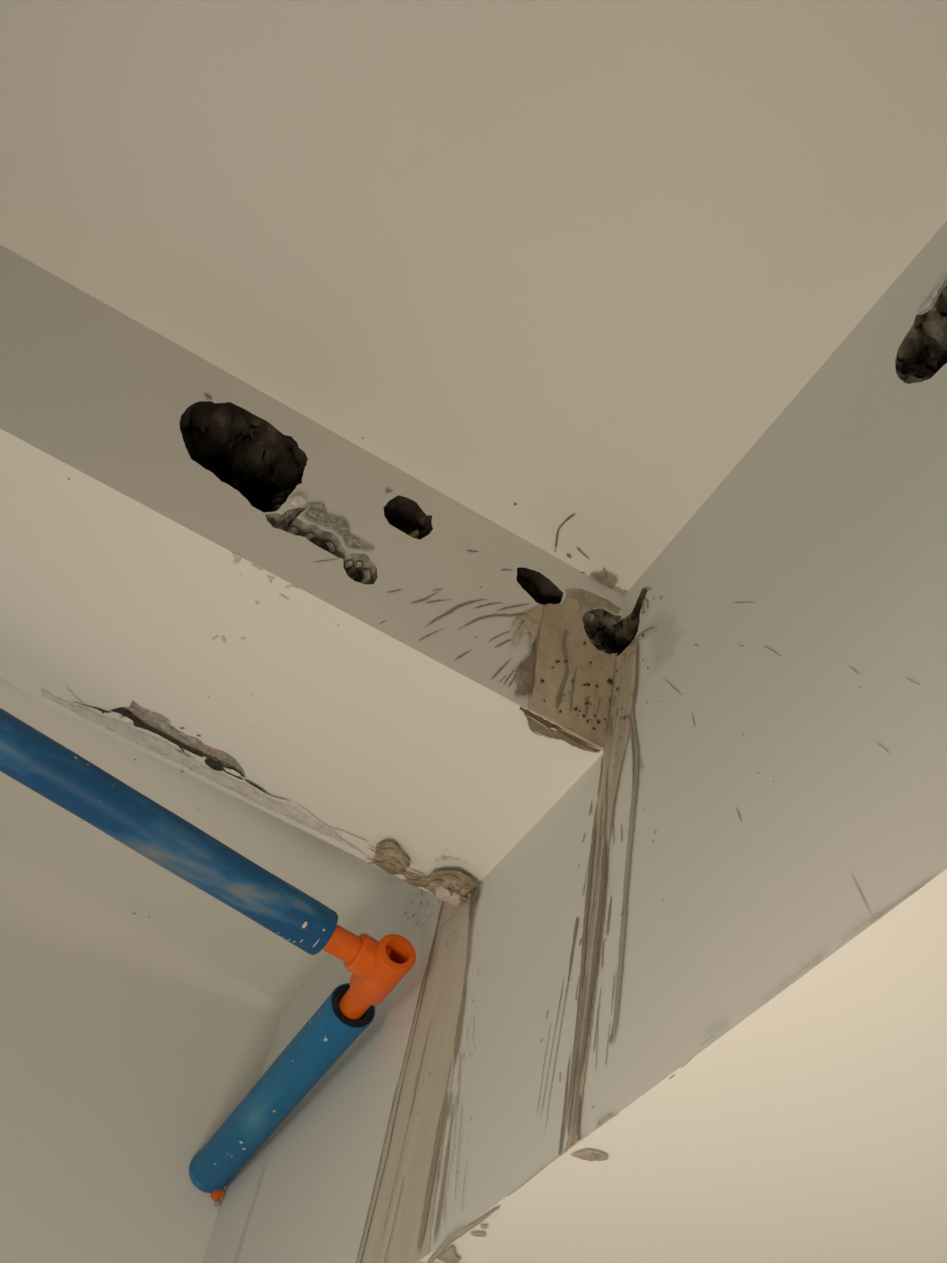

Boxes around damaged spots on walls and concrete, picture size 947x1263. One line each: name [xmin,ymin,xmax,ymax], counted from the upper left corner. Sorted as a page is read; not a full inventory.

spalling [265,492,378,585]
spalling [582,586,662,656]
spalling [110,700,246,780]
water stain [559,750,625,1154]
water stain [356,883,480,1263]